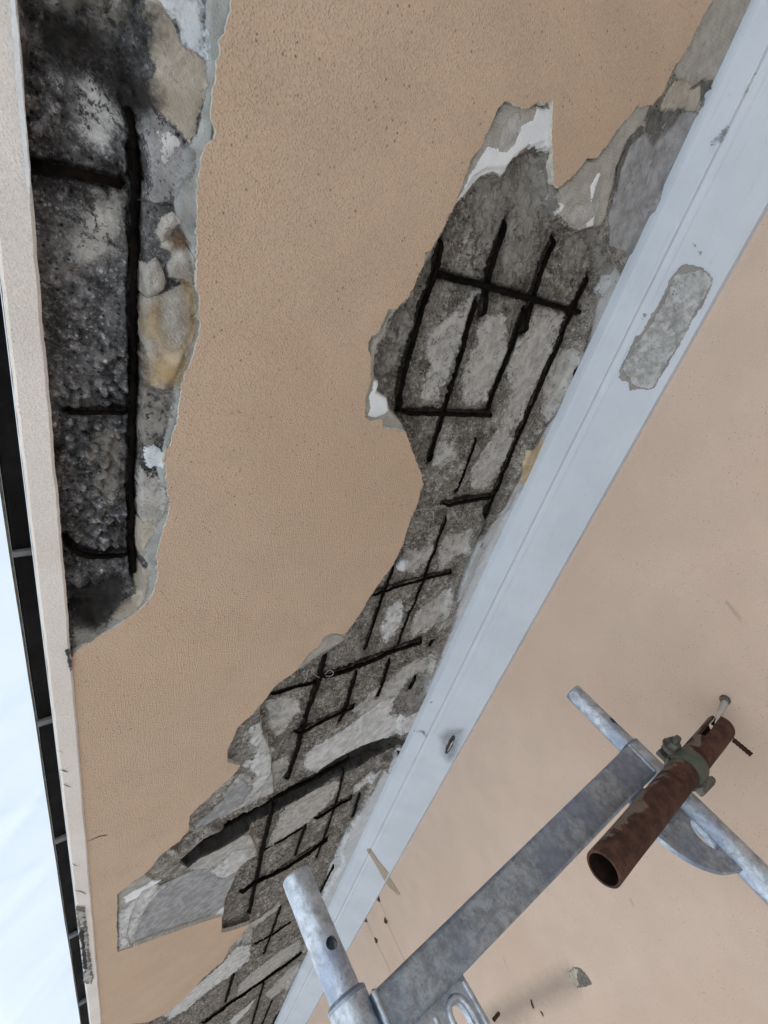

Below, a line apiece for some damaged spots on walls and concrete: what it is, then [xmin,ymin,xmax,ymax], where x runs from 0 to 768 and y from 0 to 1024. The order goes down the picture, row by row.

spalling [17,0,230,671]
peeling [618,264,713,391]
spalling [567,967,592,988]